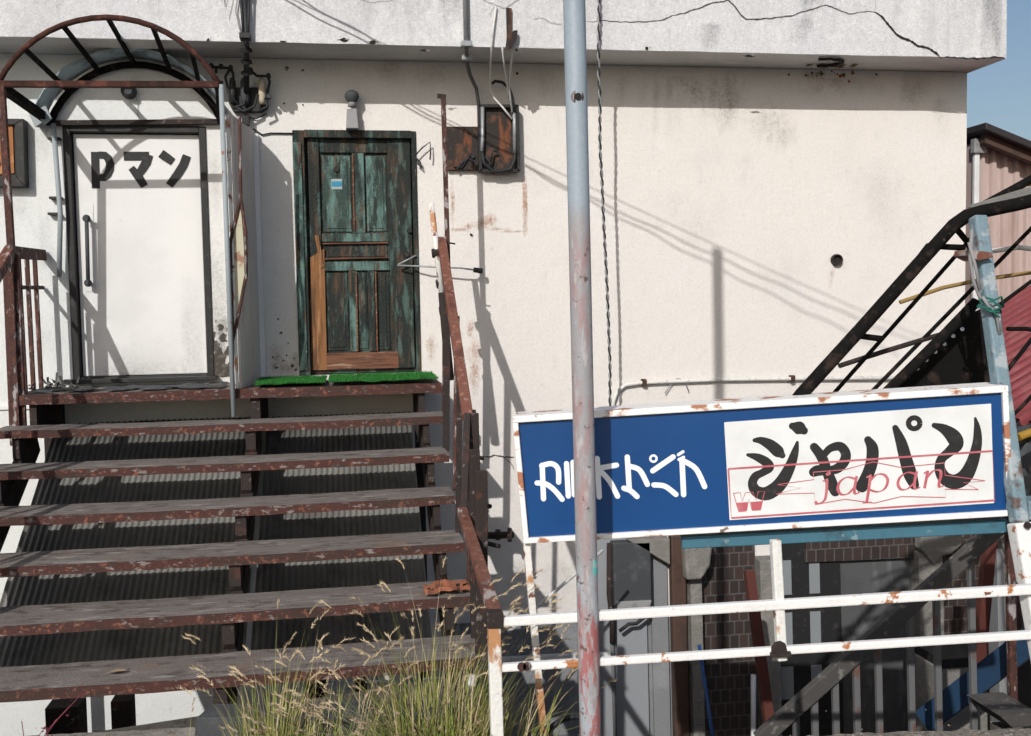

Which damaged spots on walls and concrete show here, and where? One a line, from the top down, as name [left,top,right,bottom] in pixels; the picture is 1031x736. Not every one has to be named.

crack [589,0,1004,60]